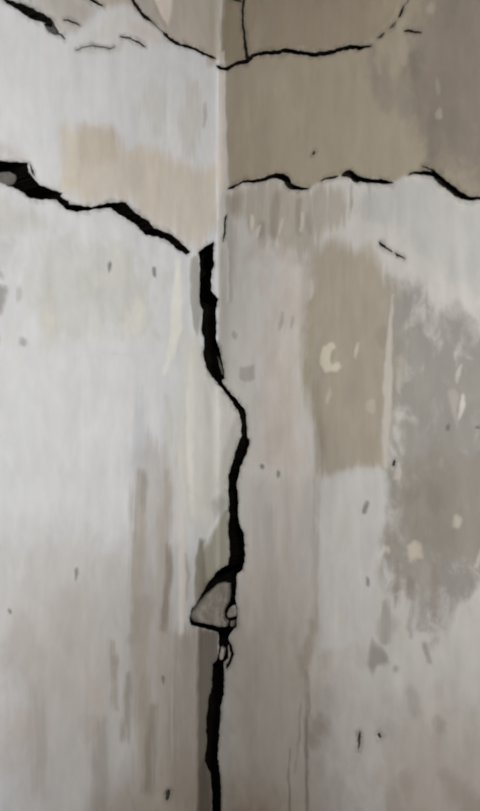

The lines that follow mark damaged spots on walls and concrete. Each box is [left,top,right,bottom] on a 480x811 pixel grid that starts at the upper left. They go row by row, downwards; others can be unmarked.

crack [4,0,145,51]
crack [131,0,422,71]
crack [228,166,480,201]
crack [379,242,405,259]
damp [0,63,242,811]
crack [0,160,250,811]
damp [213,169,480,811]